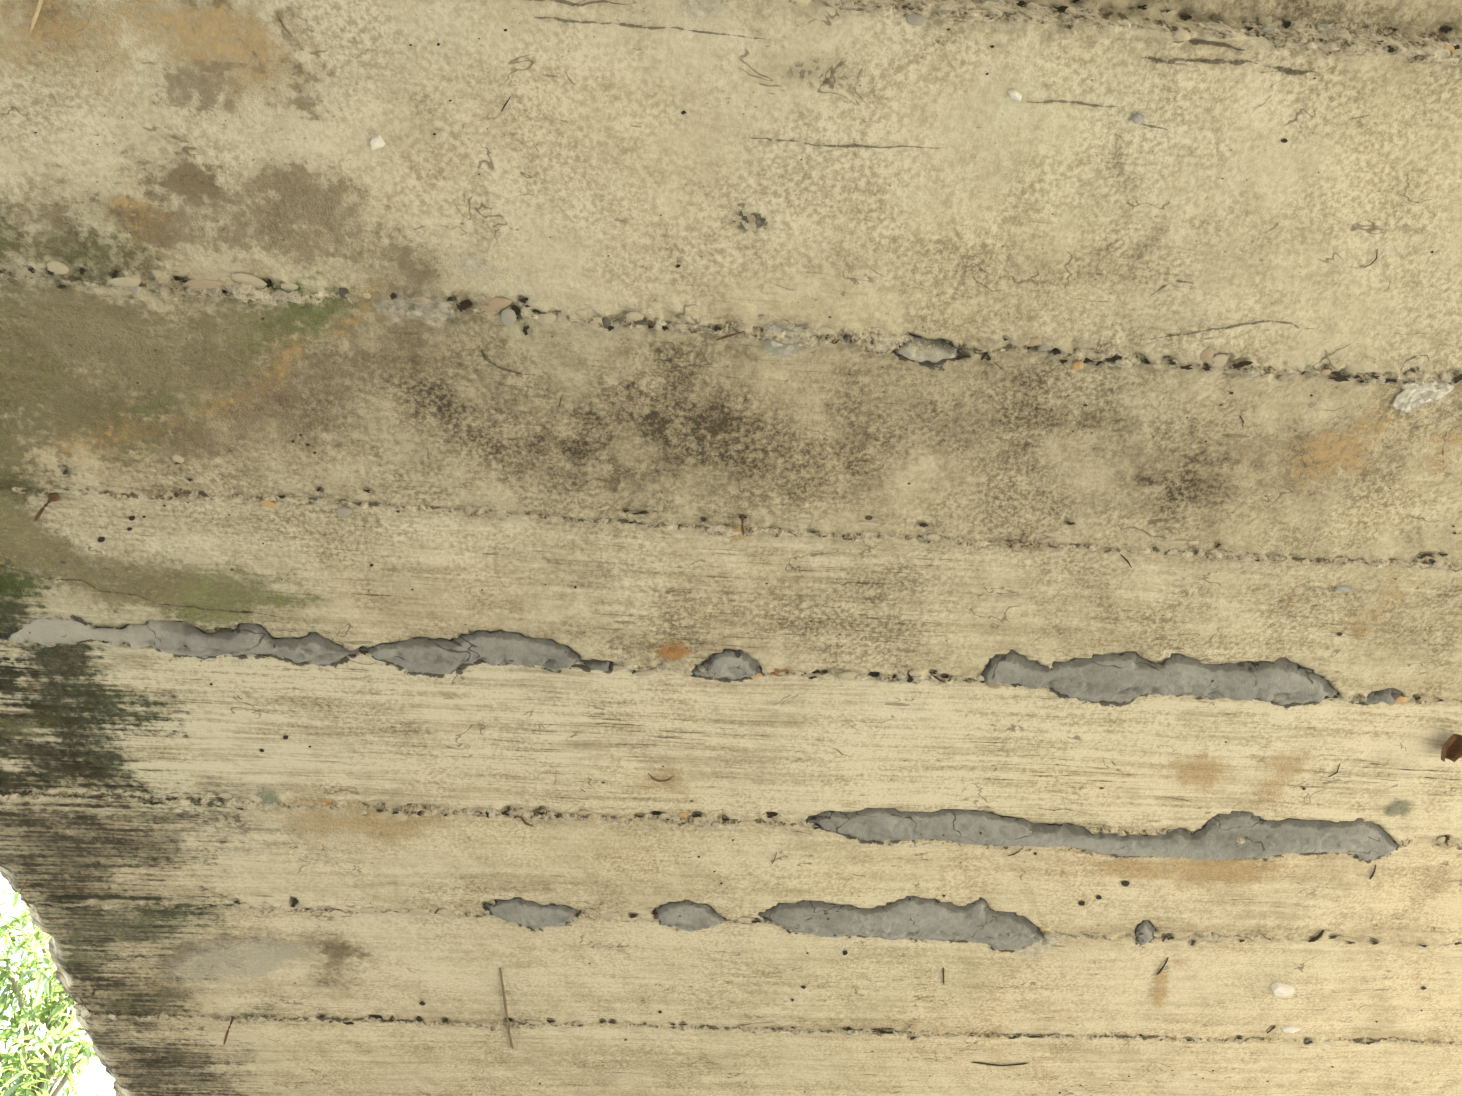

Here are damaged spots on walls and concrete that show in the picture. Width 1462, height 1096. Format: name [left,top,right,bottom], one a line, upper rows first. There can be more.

leakage [152,59,263,129]
leakage [273,6,341,120]
leakage [0,149,441,488]
leakage [0,492,369,1096]